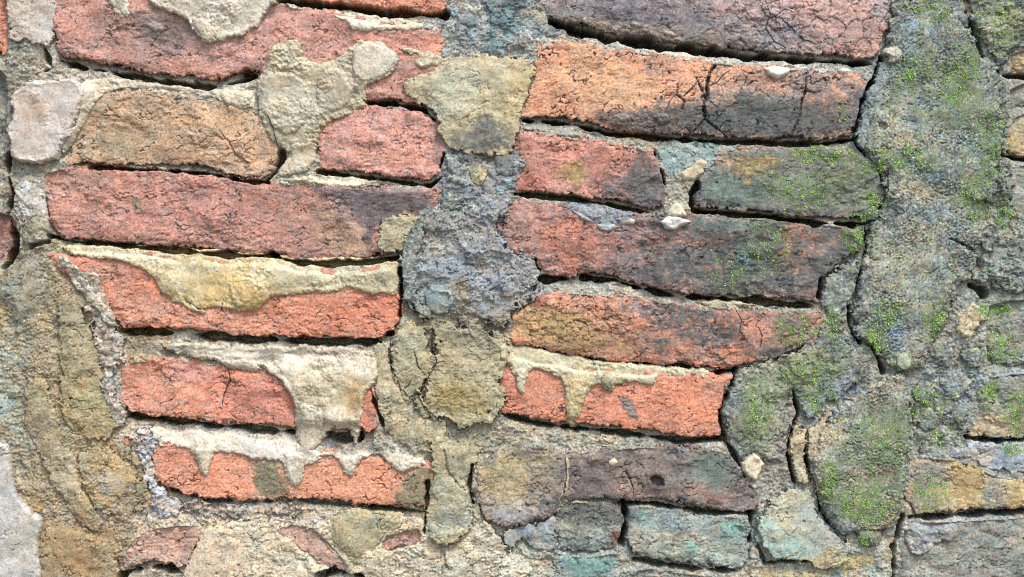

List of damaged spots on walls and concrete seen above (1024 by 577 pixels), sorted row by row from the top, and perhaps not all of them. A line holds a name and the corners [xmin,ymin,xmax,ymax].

crack [666,65,730,137]
crack [786,72,822,138]
crack [388,338,444,422]
crack [783,391,847,537]